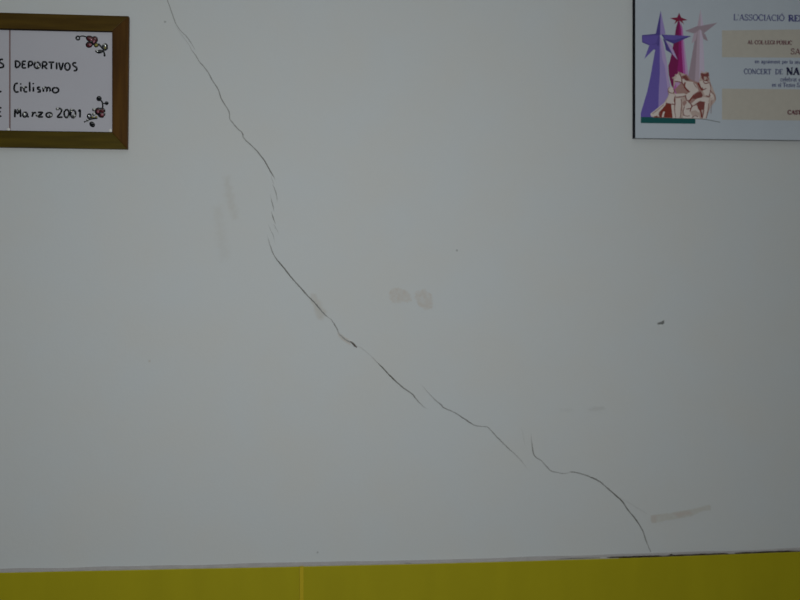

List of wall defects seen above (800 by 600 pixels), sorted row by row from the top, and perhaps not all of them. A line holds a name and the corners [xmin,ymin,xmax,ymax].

crack [167,0,800,560]